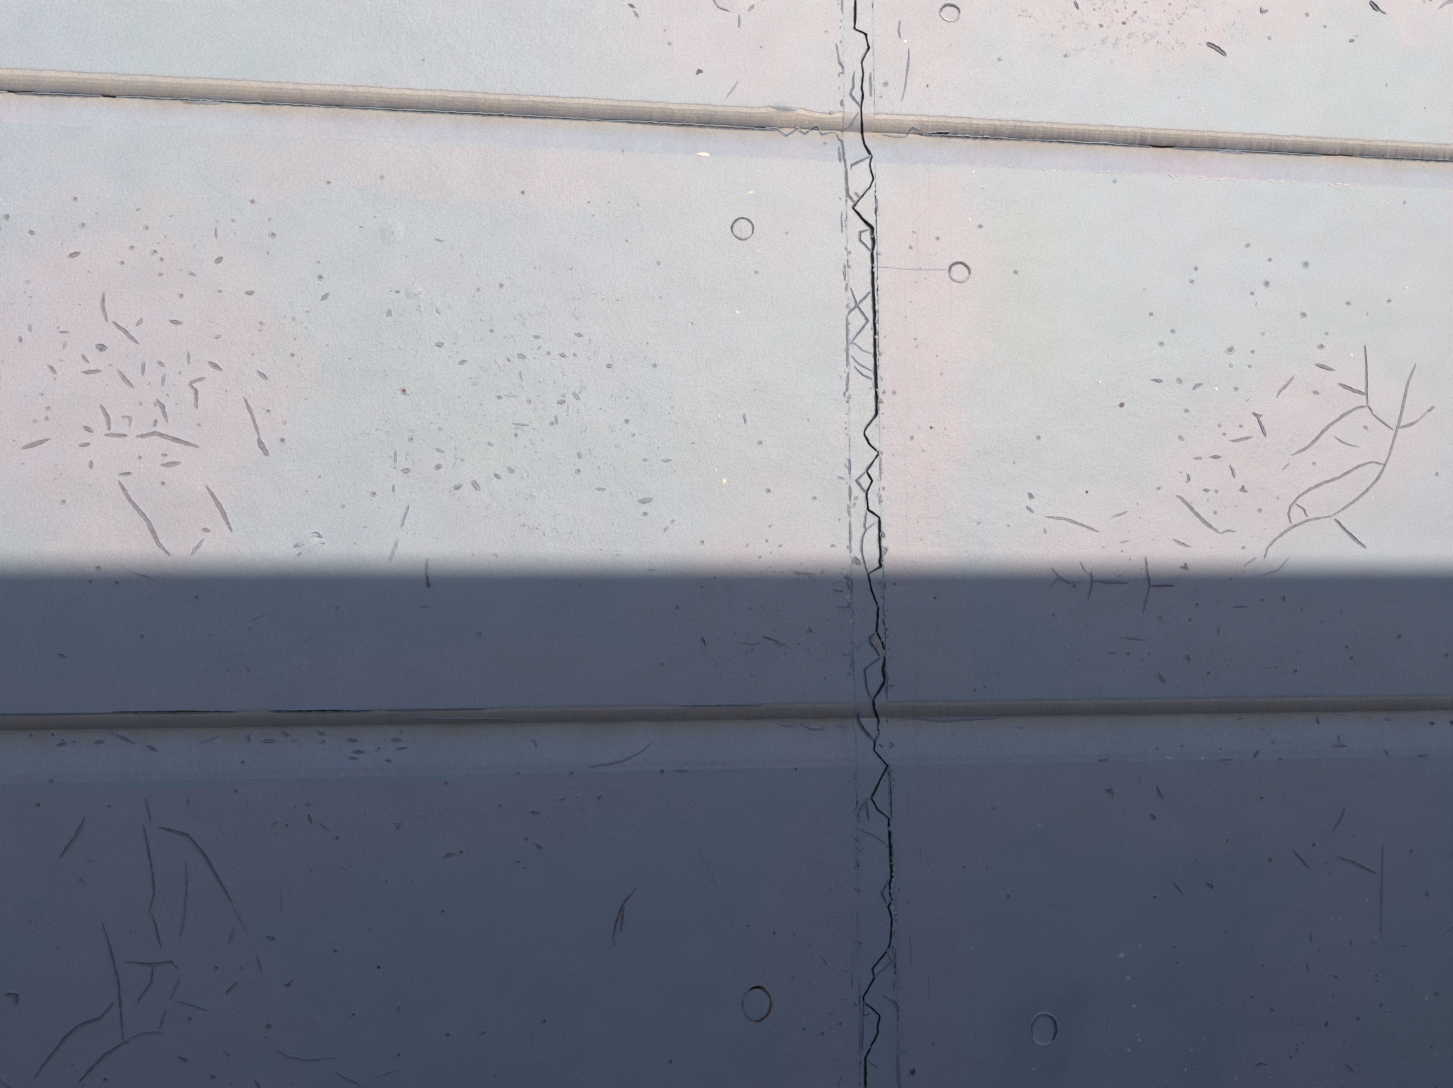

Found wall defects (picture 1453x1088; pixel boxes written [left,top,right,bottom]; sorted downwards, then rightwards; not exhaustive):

crack [1370,0,1387,14]
crack [1430,0,1453,9]
crack [1172,147,1323,157]
crack [1353,155,1453,163]
crack [1177,344,1435,577]
crack [0,0,1151,1088]
crack [1046,516,1189,613]
crack [1105,775,1164,799]